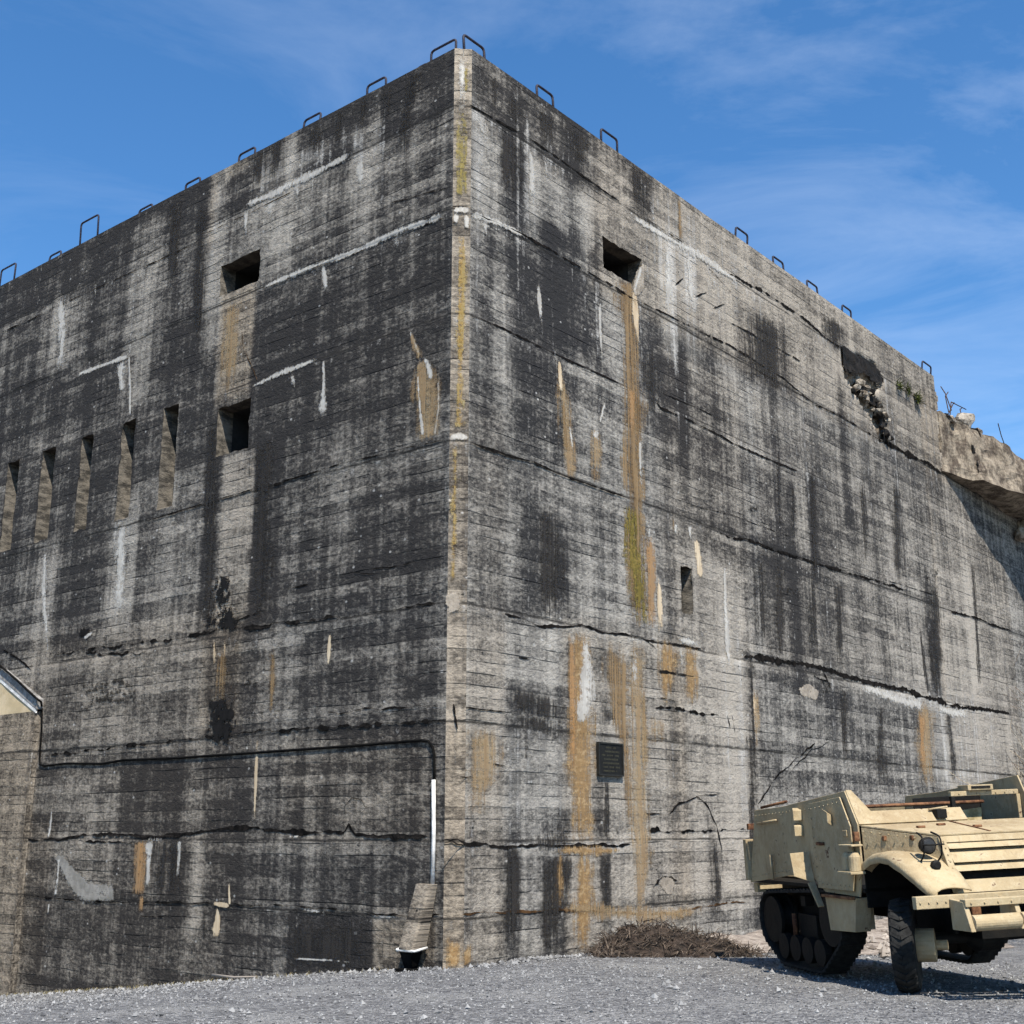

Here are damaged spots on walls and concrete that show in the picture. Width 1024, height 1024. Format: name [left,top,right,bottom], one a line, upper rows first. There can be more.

leakage [244,141,347,232]
leakage [266,214,440,288]
rust [410,332,440,438]
rust [557,362,576,476]
rust [613,282,663,631]
spalling [841,346,895,442]
leakage [207,697,236,745]
rust [661,638,699,703]
crack [744,653,1009,718]
crack [28,794,746,850]
rust [556,635,692,948]
crack [758,742,828,804]